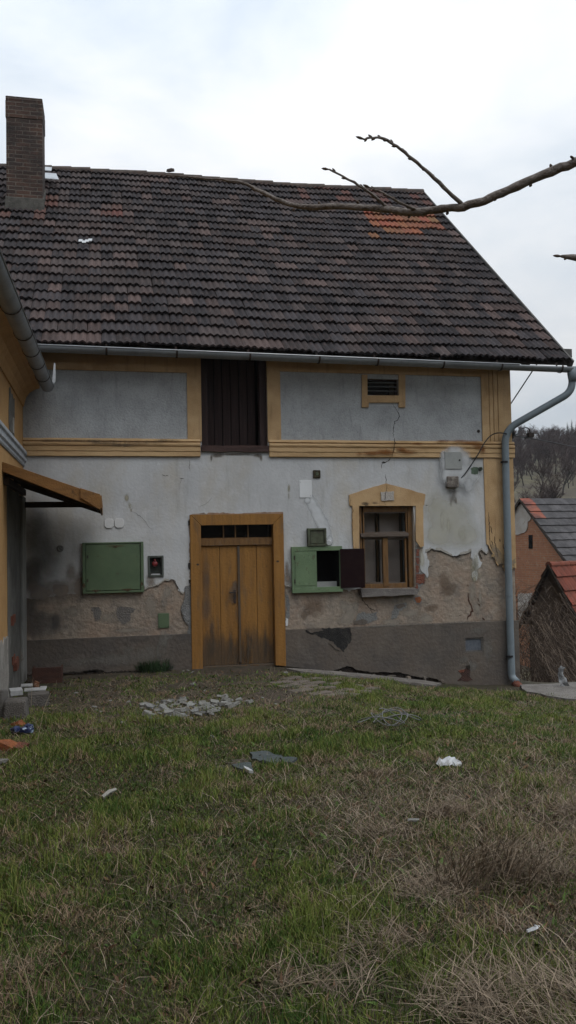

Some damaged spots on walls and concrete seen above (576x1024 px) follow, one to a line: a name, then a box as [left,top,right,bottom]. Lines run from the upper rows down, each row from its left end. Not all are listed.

crack [381,405,400,503]
peeling [0,487,283,698]
peeling [285,544,533,633]